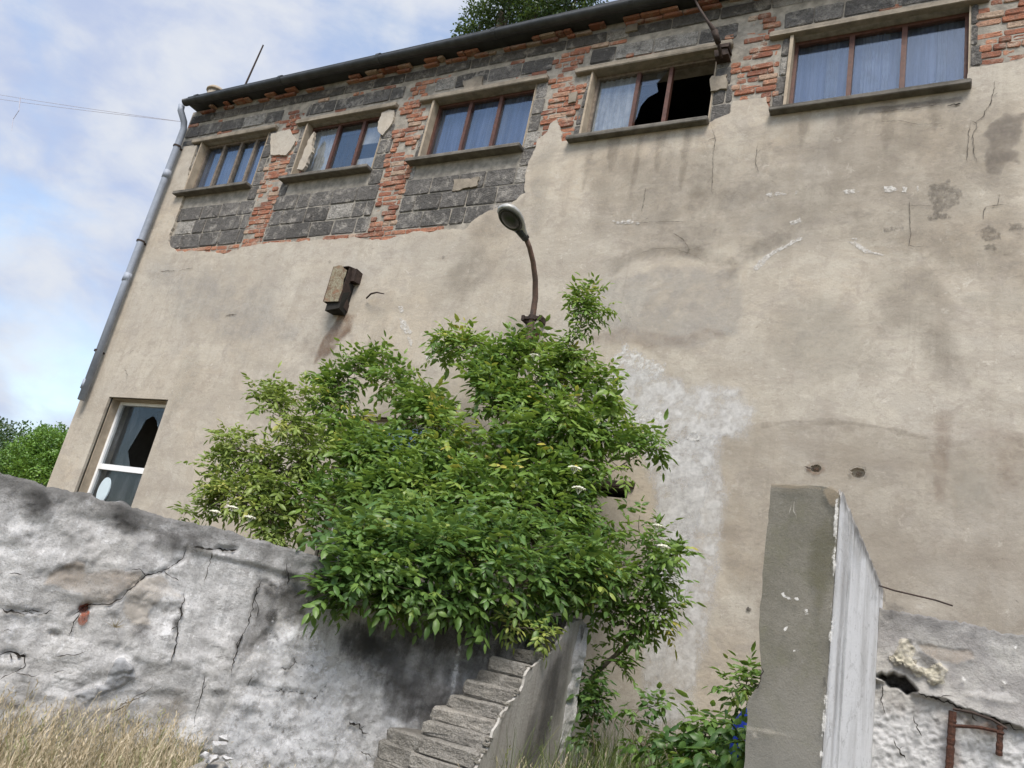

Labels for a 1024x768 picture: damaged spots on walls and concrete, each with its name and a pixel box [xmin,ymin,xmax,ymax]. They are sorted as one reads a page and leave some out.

flaking render [971,0,1024,66]
flaking render [170,0,934,254]
crack [876,81,997,161]
leakage [590,343,752,726]
crack [0,546,236,679]
crack [231,582,326,699]
spalling [880,638,972,694]